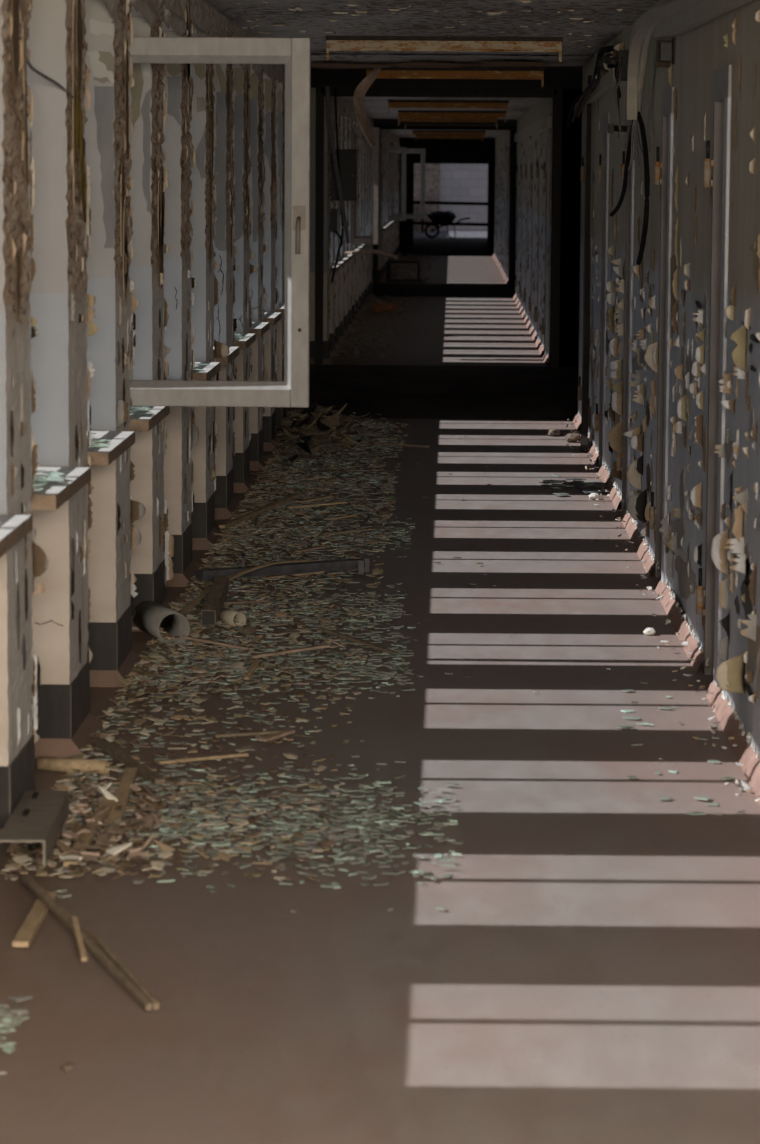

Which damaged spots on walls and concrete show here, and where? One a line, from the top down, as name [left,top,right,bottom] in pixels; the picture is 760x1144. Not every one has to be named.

peeling [9,0,39,339]
peeling [69,0,285,428]
peeling [723,12,757,152]
peeling [10,366,39,514]
peeling [15,526,48,750]
peeling [71,360,95,663]
peeling [117,449,174,617]
peeling [184,407,266,522]
peeling [588,147,760,761]